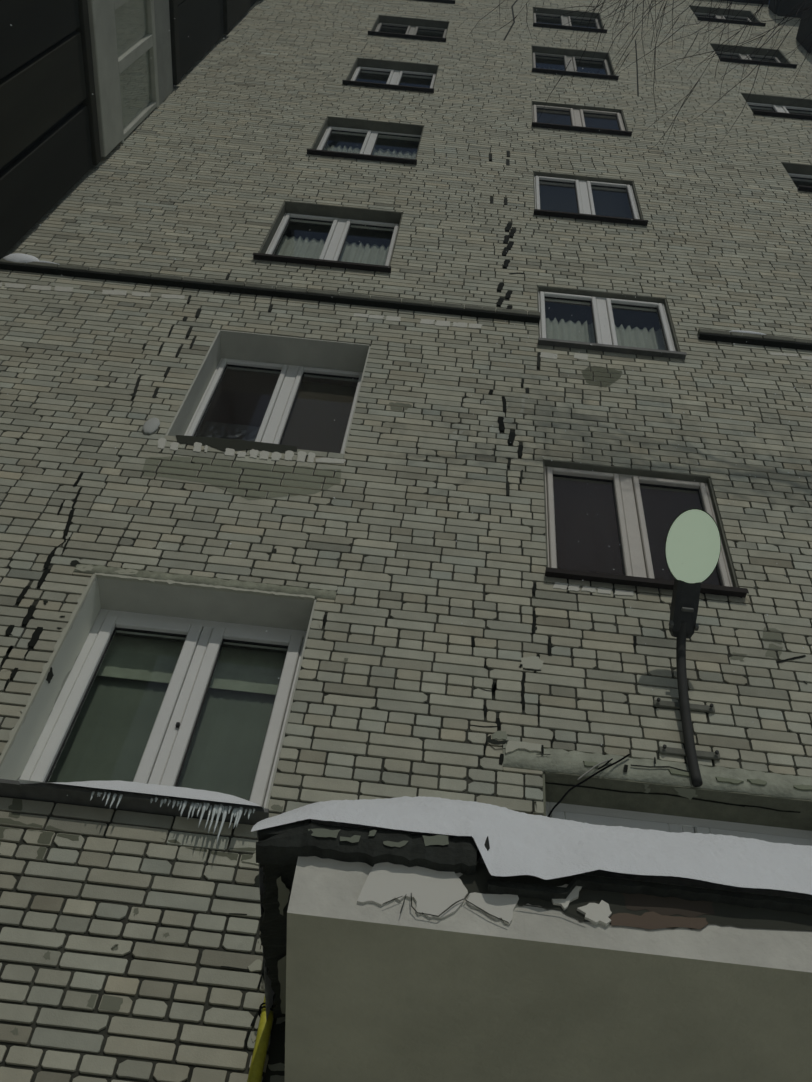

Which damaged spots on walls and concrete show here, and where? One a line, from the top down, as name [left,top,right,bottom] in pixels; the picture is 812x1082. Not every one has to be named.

crack [496,223,516,309]
crack [488,389,523,456]
crack [1,472,83,688]
peeling [308,828,408,847]
peeling [422,834,449,846]
peeling [277,876,290,915]
crack [383,892,587,923]
peeling [357,862,650,928]
spalling [669,902,812,931]
spalling [264,956,286,1082]